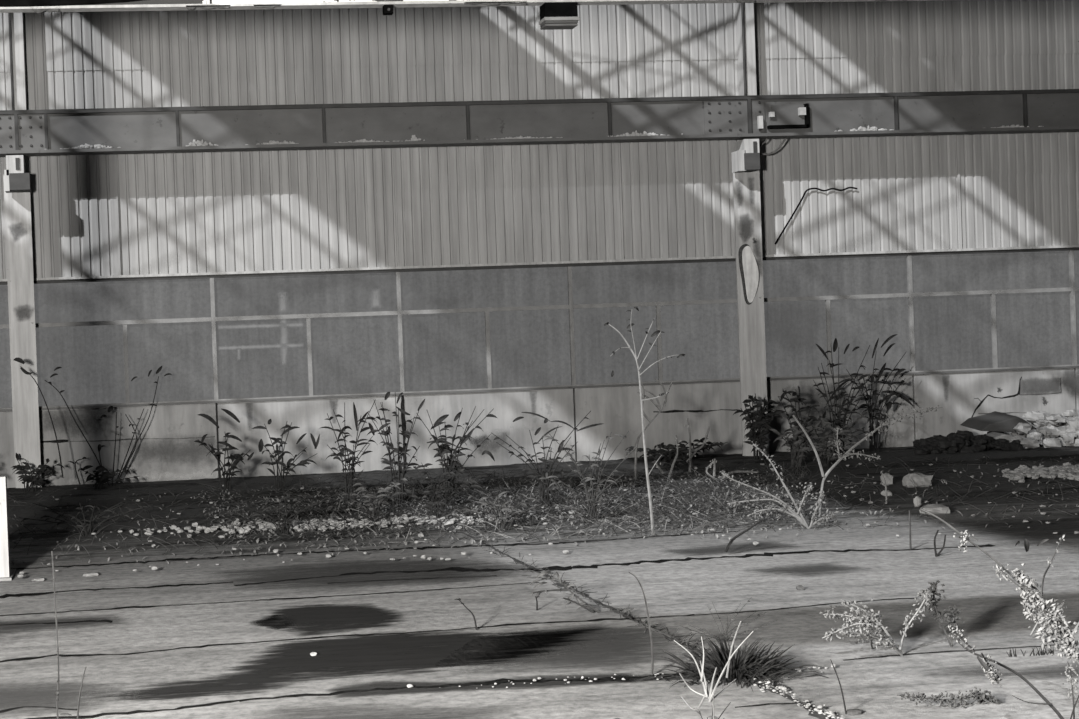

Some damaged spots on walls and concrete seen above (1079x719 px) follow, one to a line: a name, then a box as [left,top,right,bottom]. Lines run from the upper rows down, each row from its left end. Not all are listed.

leakage [0,604,698,719]